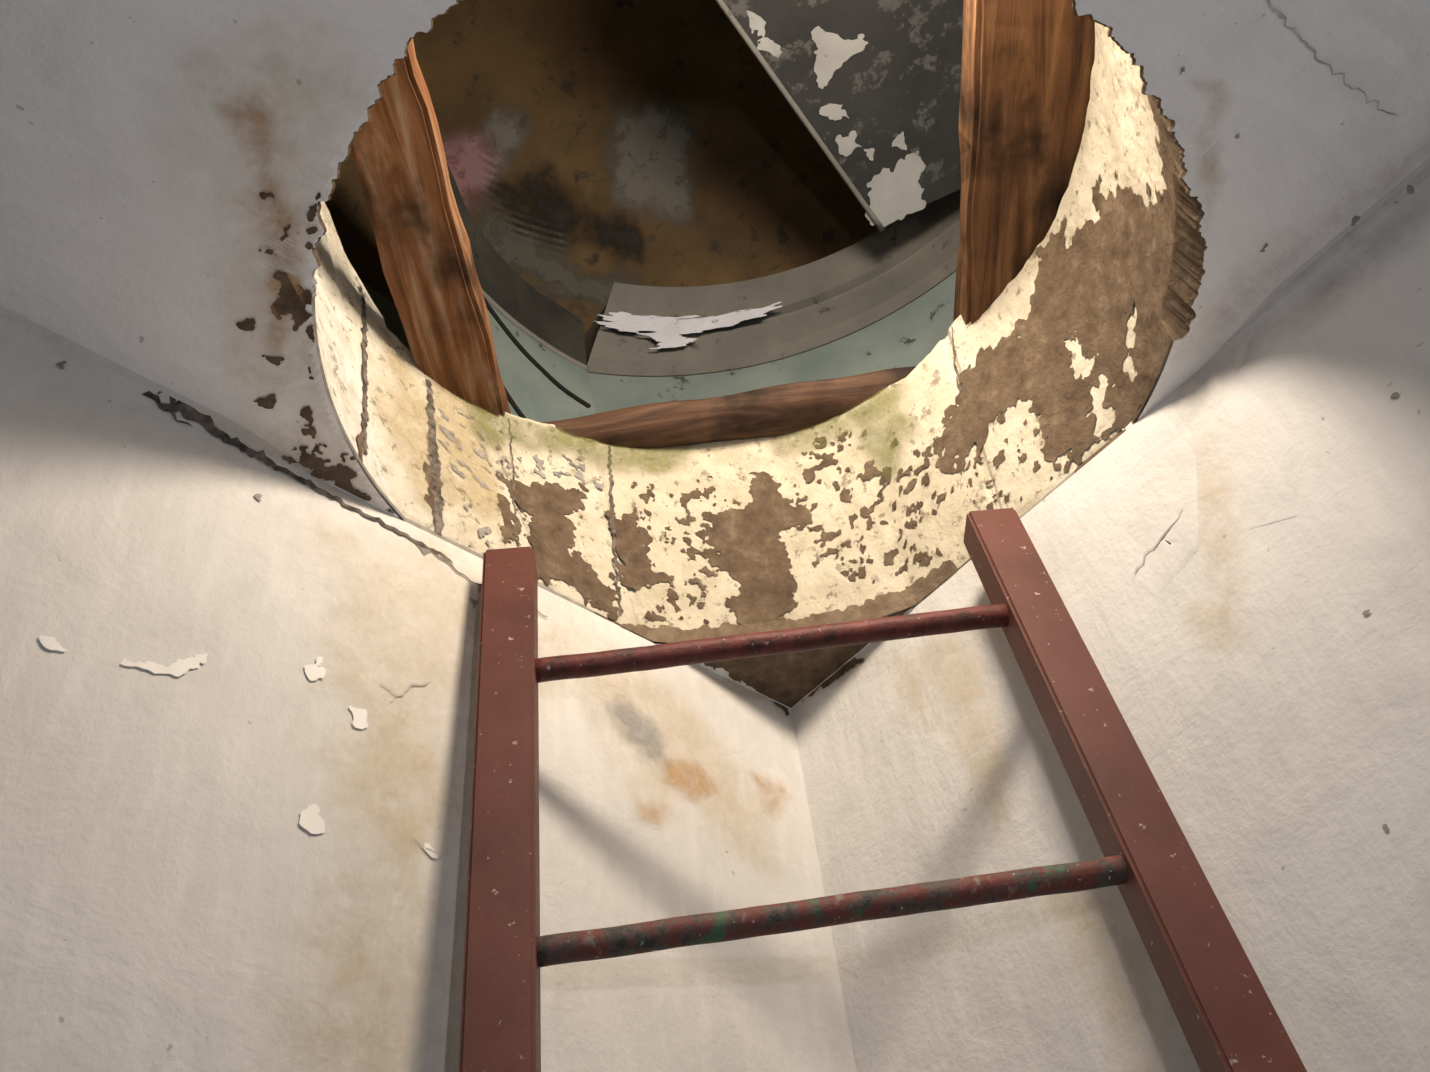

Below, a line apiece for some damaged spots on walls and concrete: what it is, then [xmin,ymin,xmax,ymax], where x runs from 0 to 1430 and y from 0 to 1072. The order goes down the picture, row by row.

crack [1267,0,1398,116]
peeling [236,318,256,331]
peeling [258,192,321,380]
peeling [253,394,277,409]
peeling [282,406,372,501]